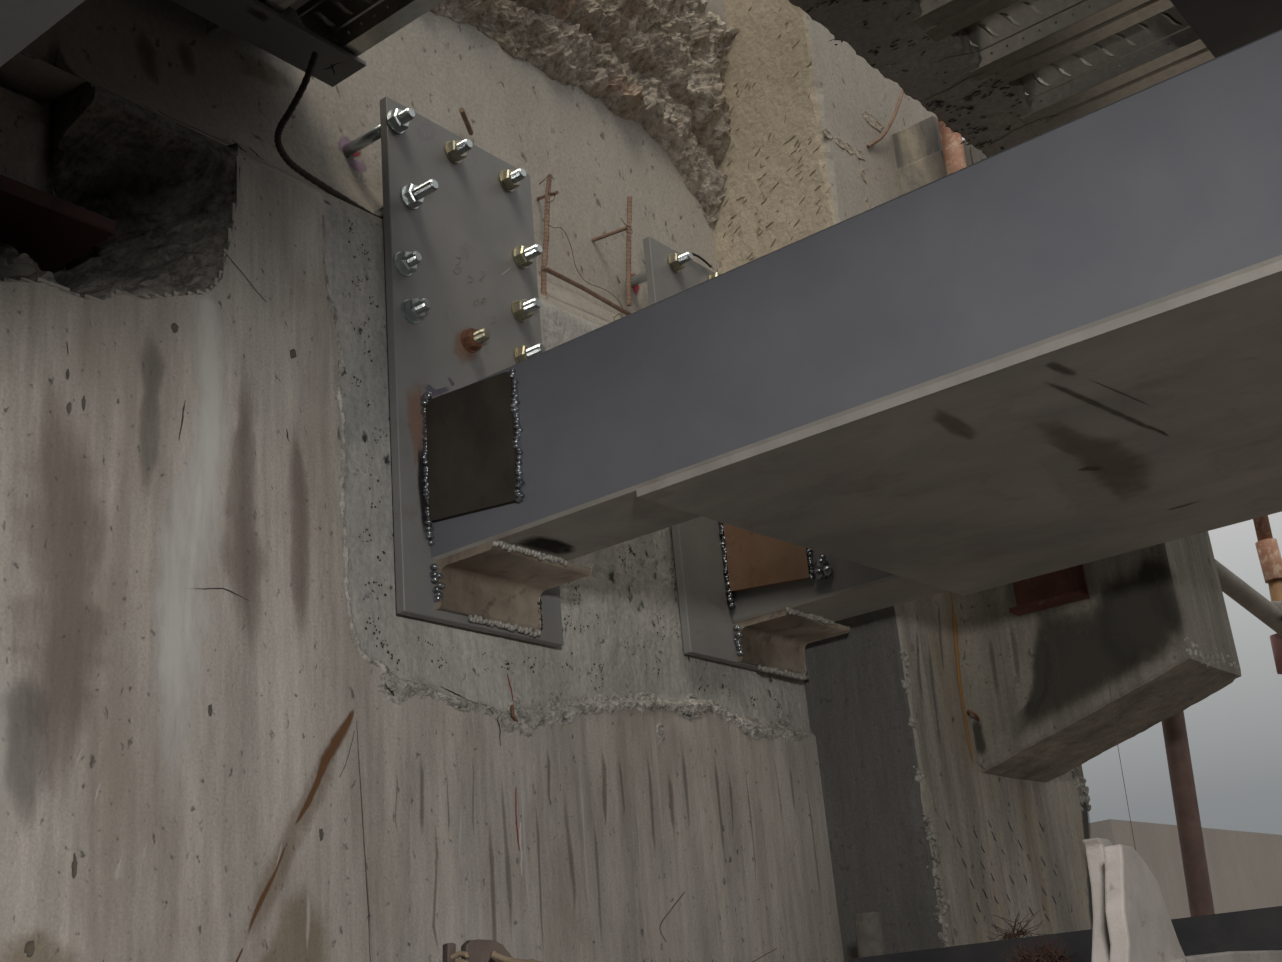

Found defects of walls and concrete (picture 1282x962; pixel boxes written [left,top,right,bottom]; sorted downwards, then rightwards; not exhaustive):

spalling [0,81,240,301]
spalling [274,52,384,220]
spalling [429,0,739,229]
spalling [537,174,632,316]
flaking render [321,215,809,745]
crack [440,686,501,746]
damp [1026,562,1182,722]
flaking render [23,940,35,957]